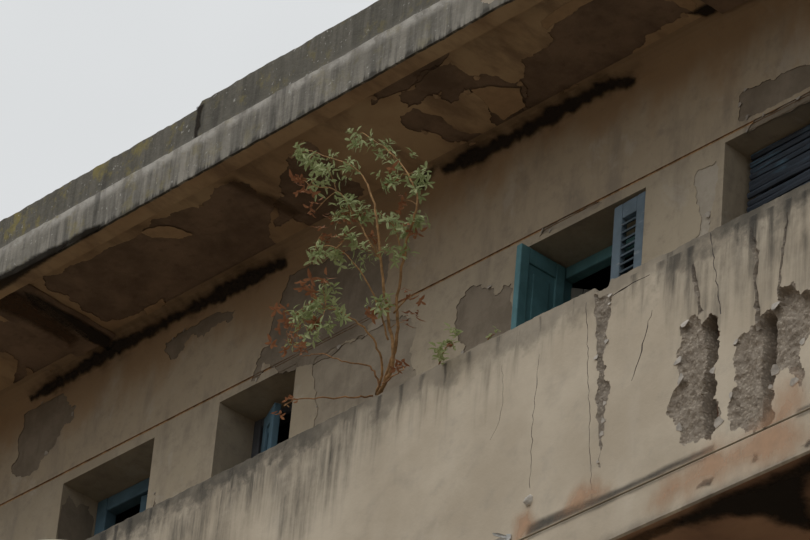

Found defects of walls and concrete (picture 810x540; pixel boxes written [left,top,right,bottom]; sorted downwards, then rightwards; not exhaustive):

water stain [416,77,635,189]
peeling [369,0,693,146]
peeling [738,64,810,134]
peeling [11,393,76,477]
water stain [0,224,287,401]
peeling [164,310,235,360]
peeling [43,140,364,322]
peeling [454,284,513,354]
crack [586,274,652,506]
crack [692,232,721,315]
spalling [666,281,810,446]
crack [750,212,788,331]